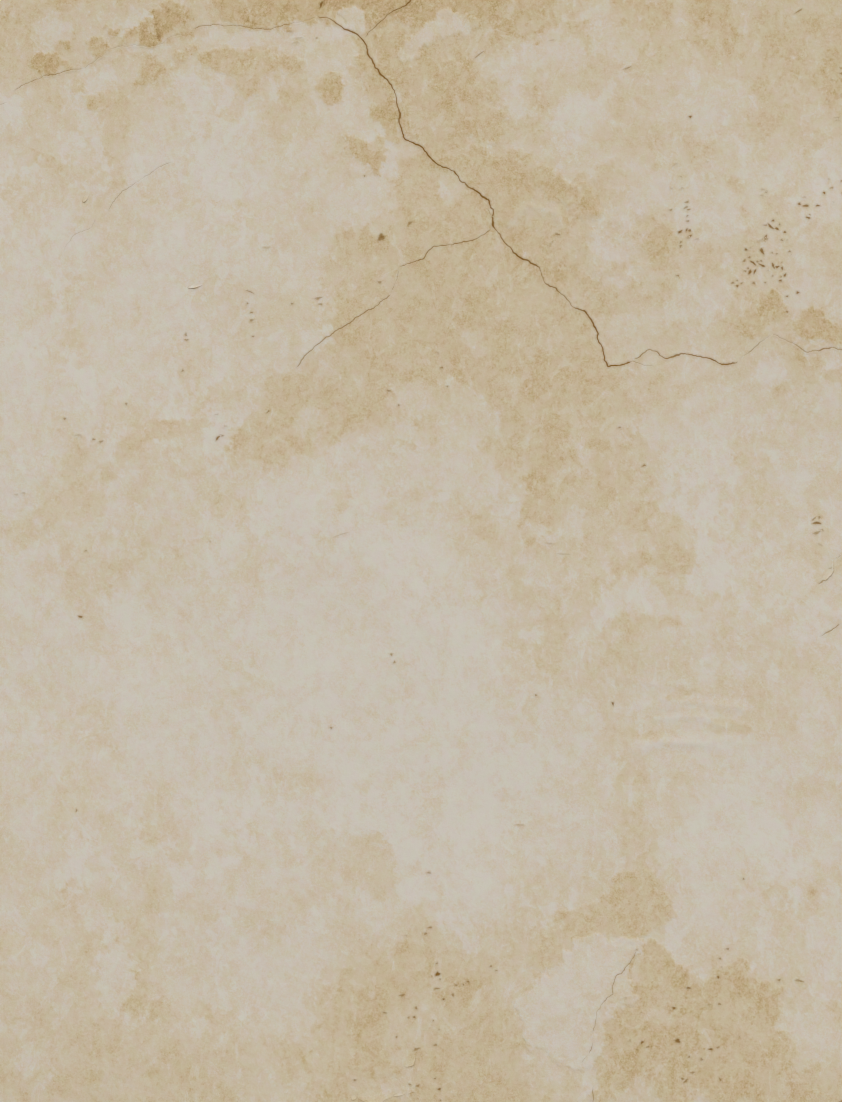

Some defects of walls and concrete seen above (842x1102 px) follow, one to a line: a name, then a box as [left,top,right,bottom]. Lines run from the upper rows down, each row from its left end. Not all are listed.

crack [0,0,842,370]